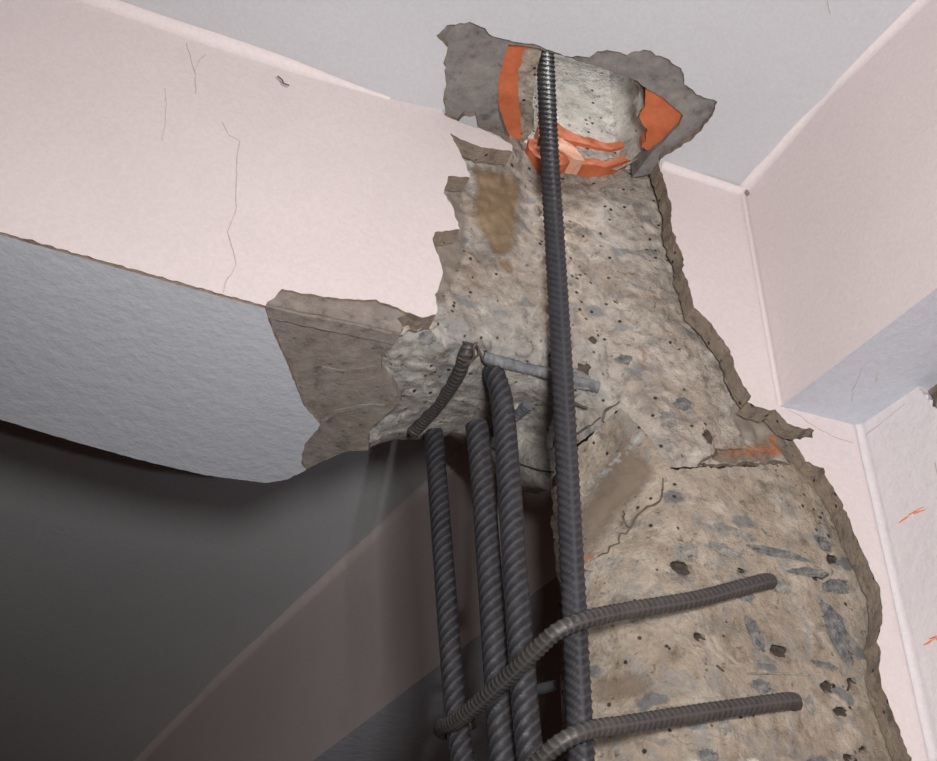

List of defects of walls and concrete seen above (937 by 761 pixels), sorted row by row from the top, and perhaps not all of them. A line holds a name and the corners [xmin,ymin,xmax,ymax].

crack [222,121,240,292]
damp [474,168,518,272]
spalling [266,22,892,761]
crack [598,478,664,557]